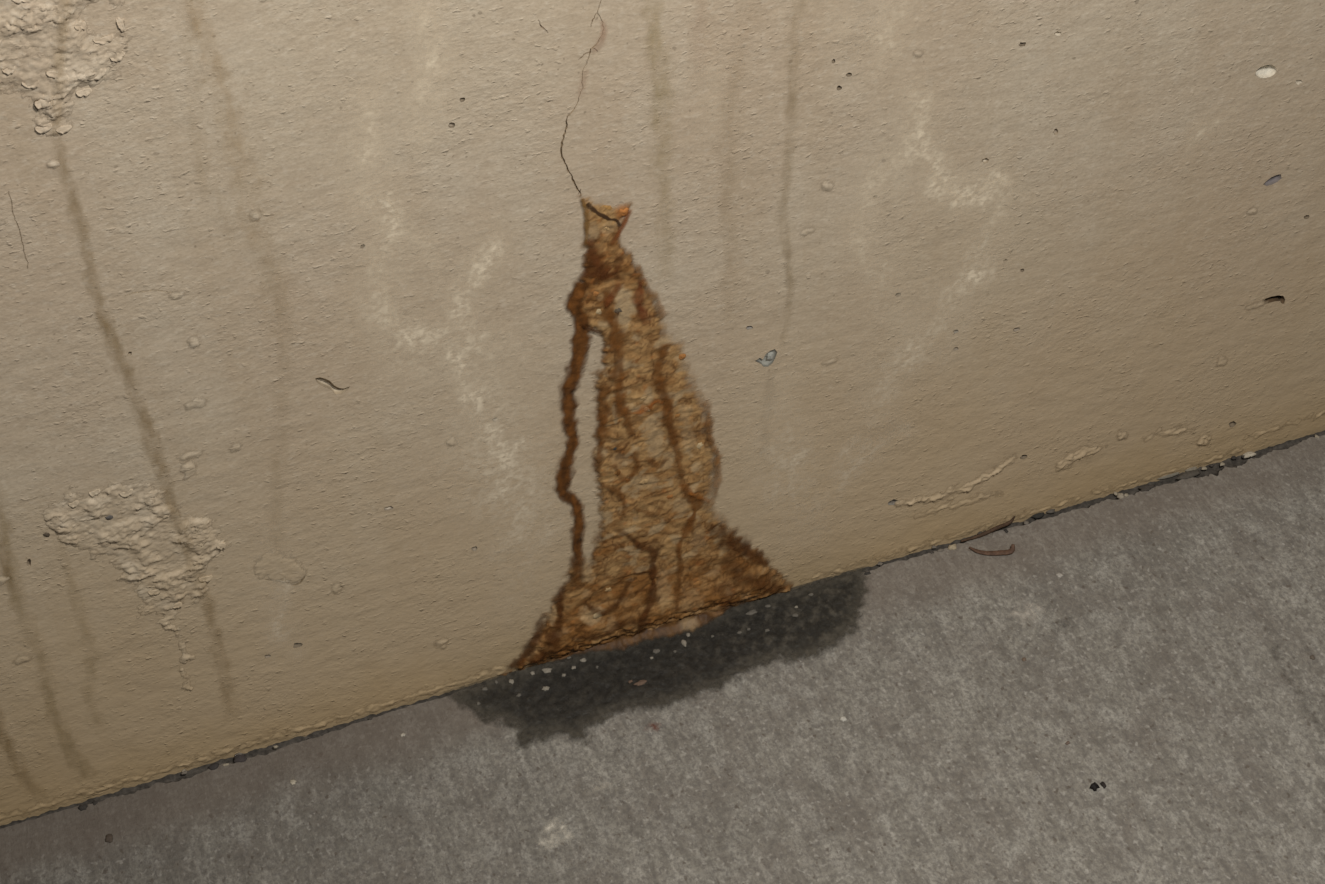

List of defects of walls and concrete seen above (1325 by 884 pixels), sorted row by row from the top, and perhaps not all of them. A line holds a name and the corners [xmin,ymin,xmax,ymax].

crack [560,0,604,196]
corrosion [503,198,793,676]
water stain [451,568,868,746]